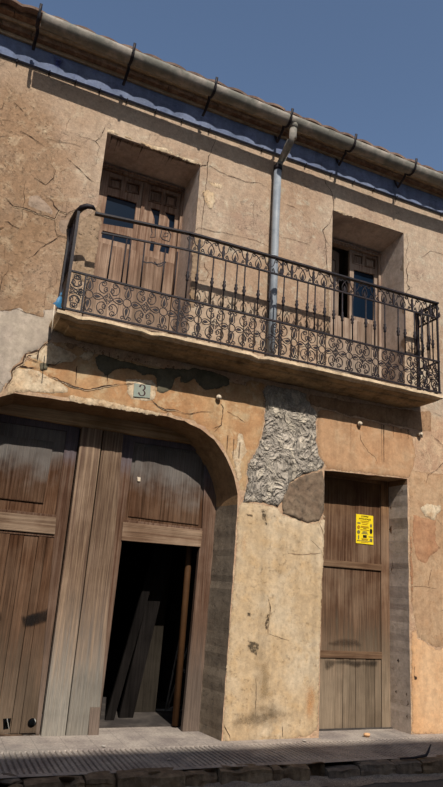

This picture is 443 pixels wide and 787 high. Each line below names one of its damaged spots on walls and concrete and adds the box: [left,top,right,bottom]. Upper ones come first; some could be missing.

crack [0,104,105,256]
crack [196,140,269,247]
peeling [7,343,162,416]
crack [0,340,244,429]
peeling [410,503,441,602]